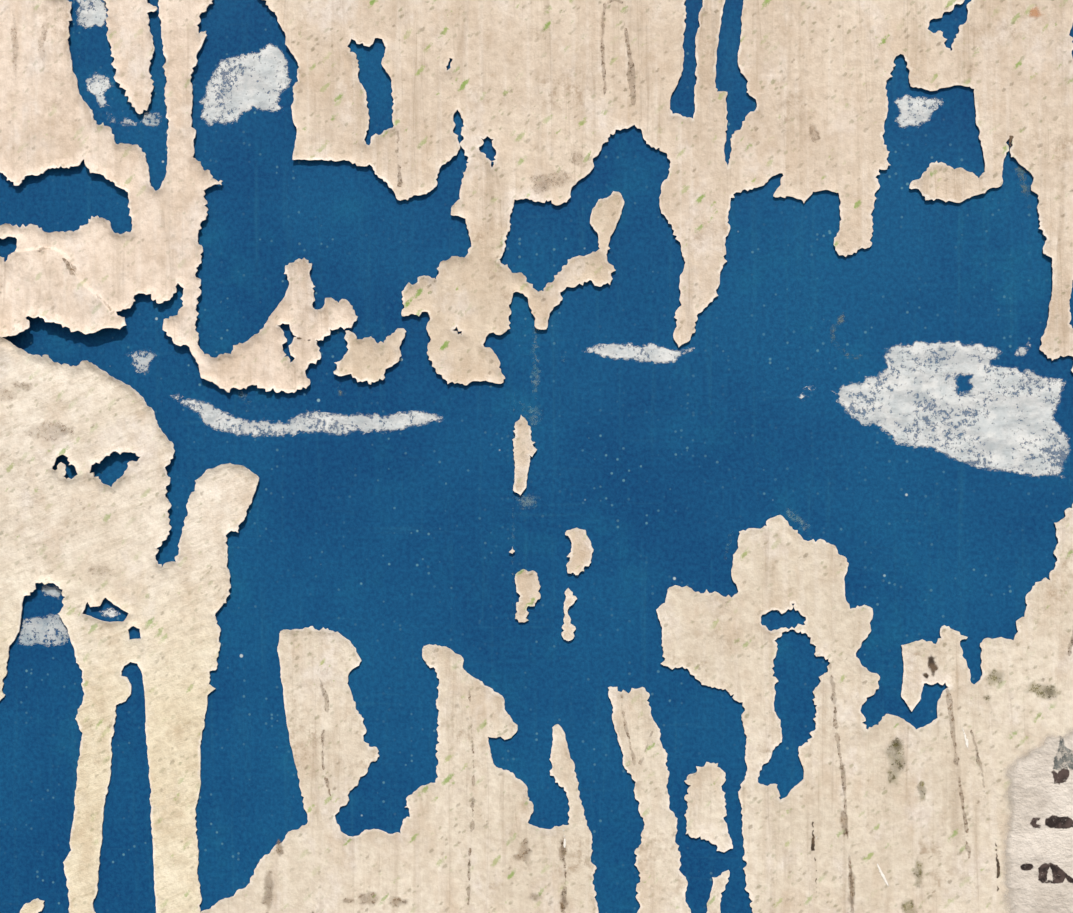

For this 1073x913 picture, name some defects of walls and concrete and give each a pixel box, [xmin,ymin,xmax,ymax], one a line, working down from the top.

peeling [0,0,1073,393]
peeling [512,415,537,495]
peeling [565,528,594,575]
peeling [515,569,541,622]
peeling [562,588,577,641]
peeling [608,504,1073,913]
peeling [200,626,599,913]
peeling [20,898,44,913]